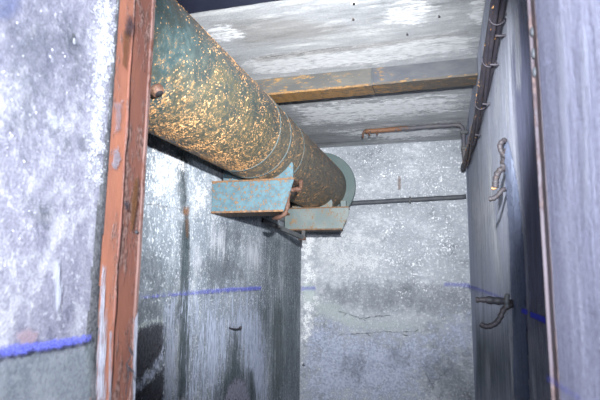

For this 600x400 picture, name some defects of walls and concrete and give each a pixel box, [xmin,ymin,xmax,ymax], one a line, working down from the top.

leakage [218,331,256,400]